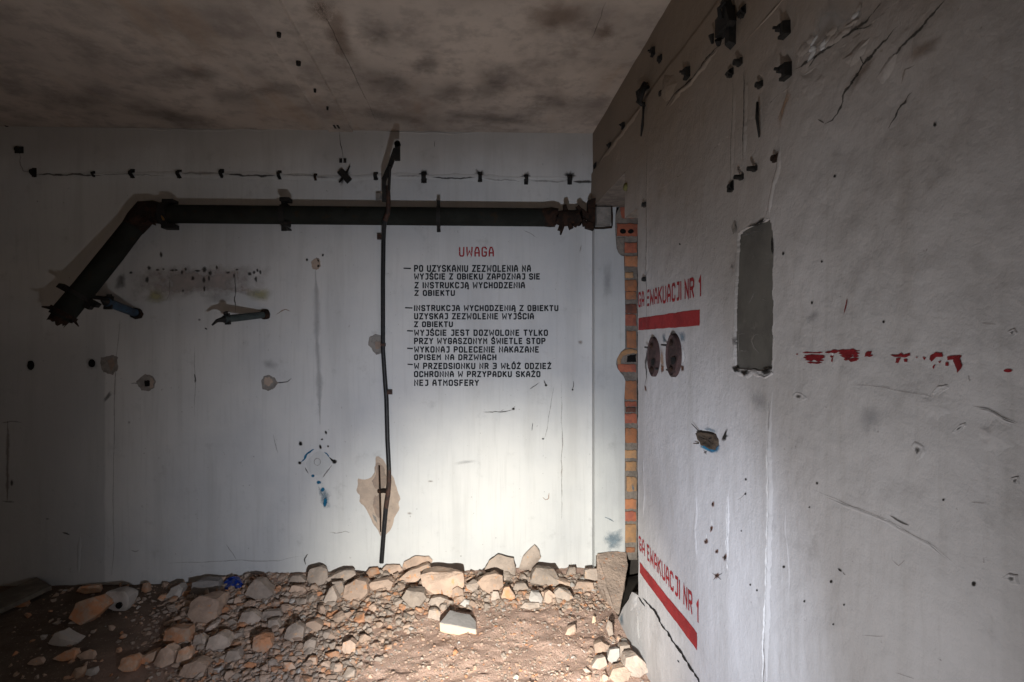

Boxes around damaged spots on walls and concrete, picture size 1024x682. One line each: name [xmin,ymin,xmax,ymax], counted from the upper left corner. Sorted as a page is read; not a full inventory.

crack [796,0,945,127]
spalling [368,334,381,355]
spalling [100,355,118,375]
spalling [136,374,156,391]
spalling [261,375,289,391]
spalling [357,456,400,536]
crack [638,597,699,682]